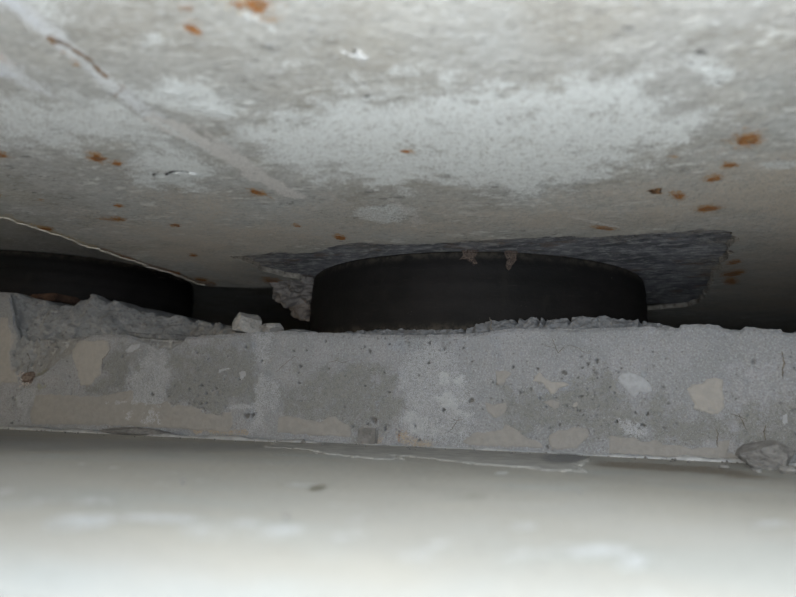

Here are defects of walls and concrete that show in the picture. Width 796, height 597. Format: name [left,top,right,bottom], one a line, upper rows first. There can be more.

corrosion [179,4,203,37]
corrosion [215,0,288,23]
corrosion [45,35,109,79]
corrosion [721,125,769,150]
corrosion [86,151,125,166]
corrosion [703,161,738,183]
corrosion [648,188,721,213]